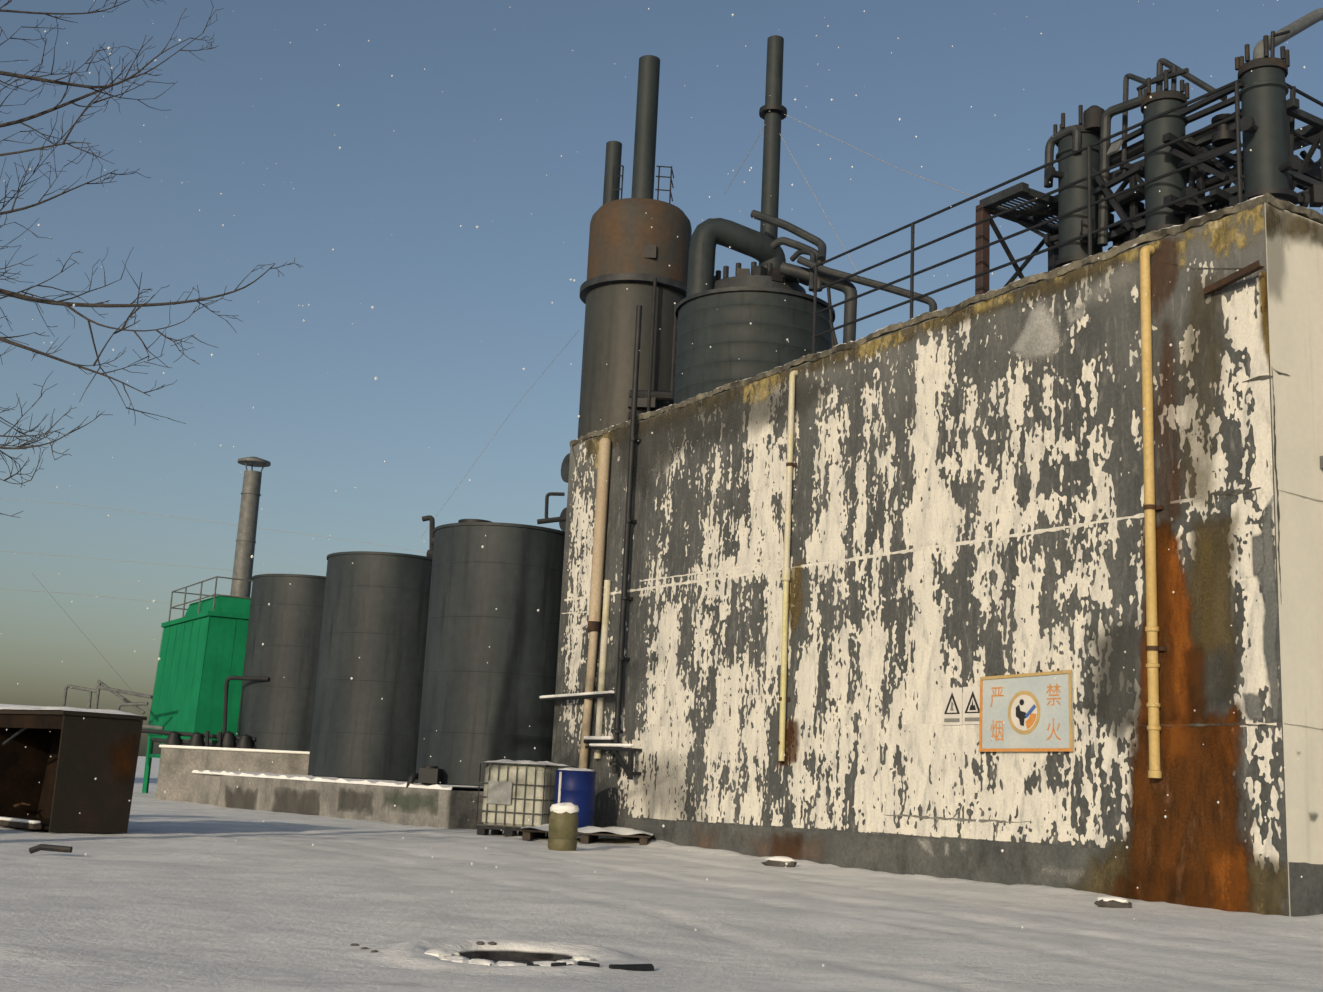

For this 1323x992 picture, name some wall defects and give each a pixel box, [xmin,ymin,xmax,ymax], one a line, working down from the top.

leakage [1265,203,1323,244]
peeling [559,259,1284,866]
rust [1078,523,1286,915]